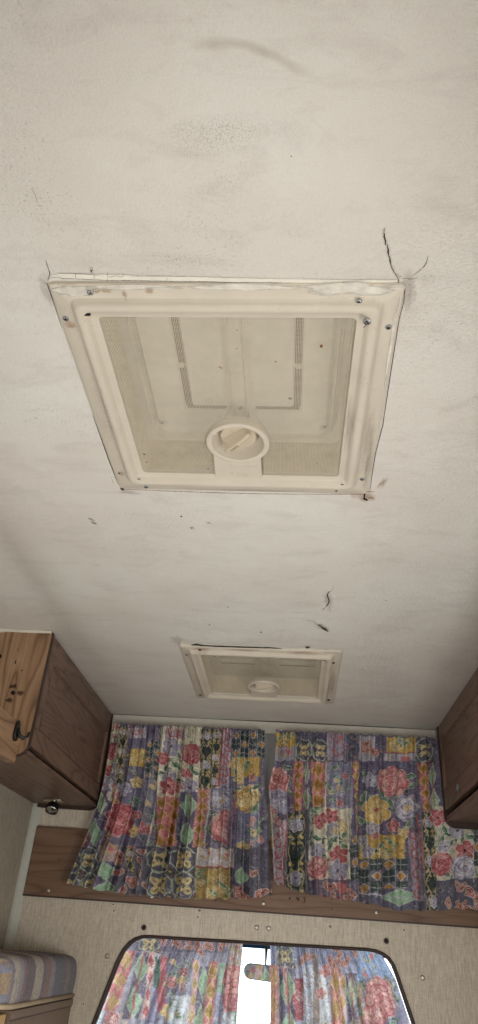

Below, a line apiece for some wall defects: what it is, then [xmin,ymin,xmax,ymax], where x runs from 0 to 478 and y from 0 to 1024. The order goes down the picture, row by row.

crack [381,228,428,290]